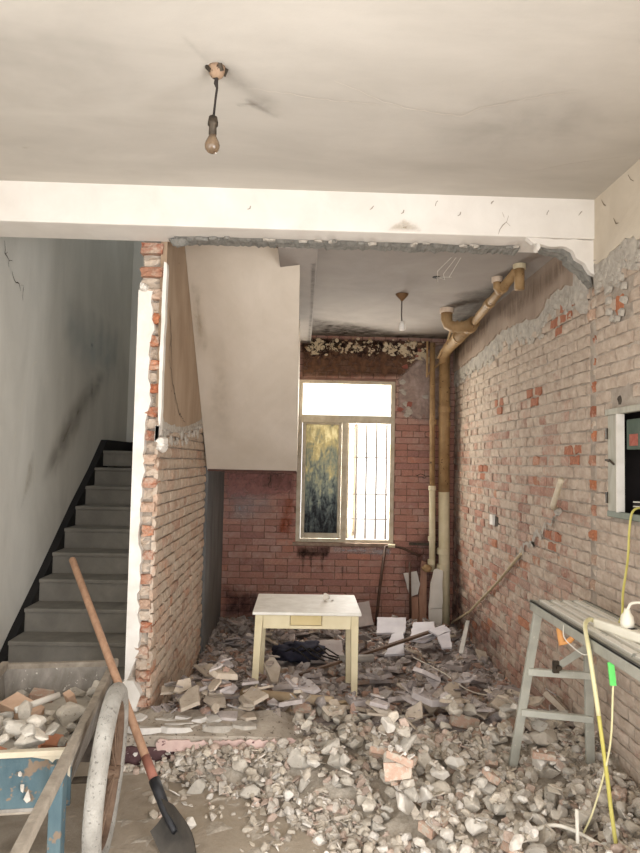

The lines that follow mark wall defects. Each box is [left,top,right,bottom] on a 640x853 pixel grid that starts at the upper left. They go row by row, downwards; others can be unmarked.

spalling [169,236,520,256]
spalling [450,236,640,388]
peeling [302,337,443,419]
spalling [526,387,542,407]
spalling [564,445,596,466]
peeling [122,262,203,712]
spalling [588,480,597,541]
spalling [545,530,562,552]
damp [298,548,328,557]